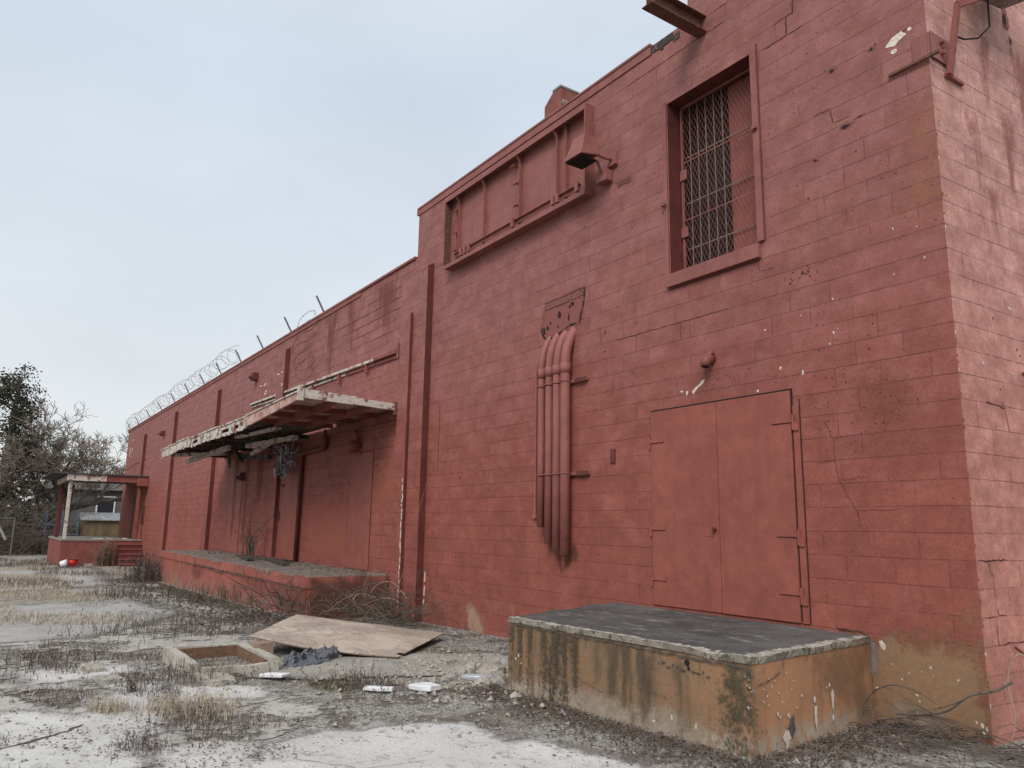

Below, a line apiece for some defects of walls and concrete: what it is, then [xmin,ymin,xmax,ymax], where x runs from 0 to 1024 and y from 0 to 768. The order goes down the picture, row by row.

peeling [866,27,911,54]
spalling [541,287,586,340]
crack [819,420,896,526]
crack [978,559,1024,646]
damp [506,617,701,743]